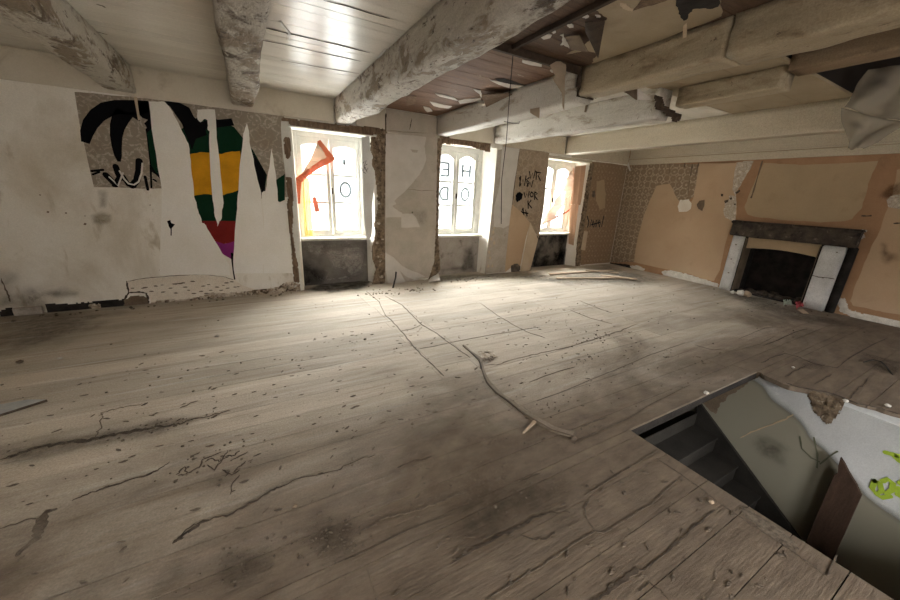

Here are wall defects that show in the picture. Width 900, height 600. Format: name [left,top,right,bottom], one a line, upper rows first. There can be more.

peeling [541,15,605,57]
peeling [423,80,524,112]
peeling [522,60,566,109]
peeling [283,137,291,159]
peeling [362,128,442,284]
peeling [487,146,519,268]
peeling [678,199,705,212]
peeling [45,177,301,312]
peeling [511,223,538,272]
crack [369,293,718,401]
crack [0,401,229,460]
crack [0,451,374,557]